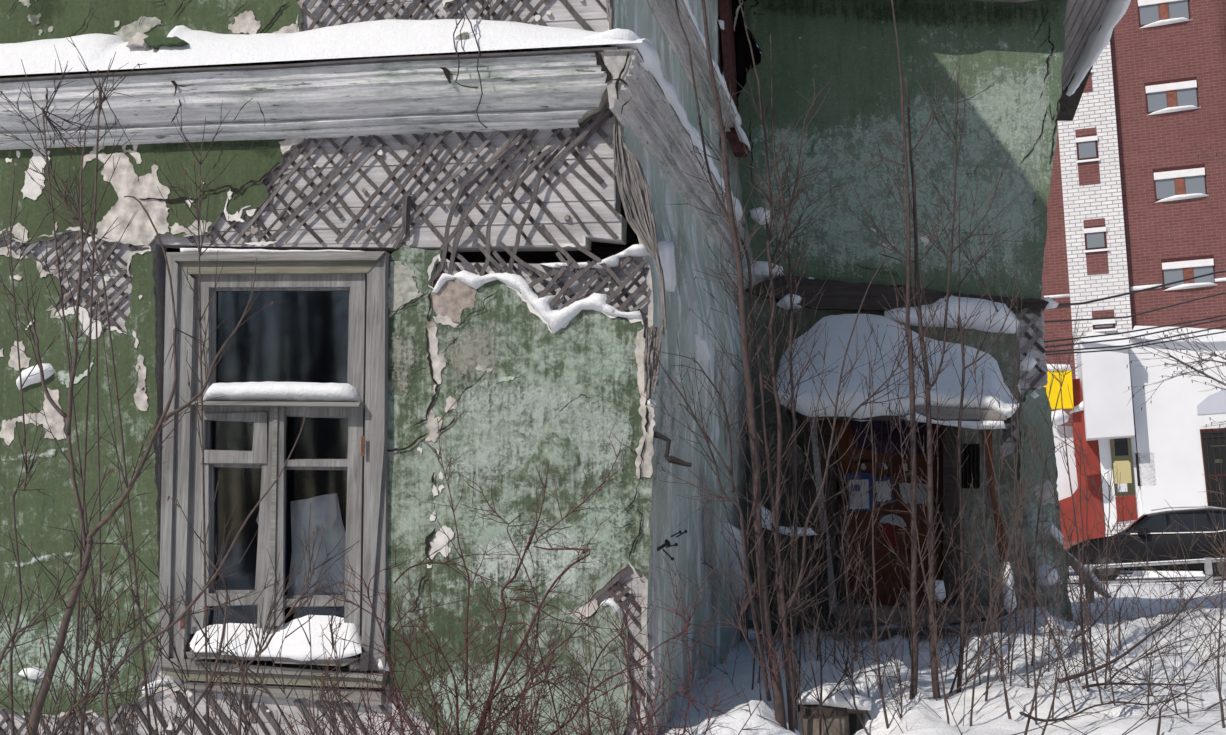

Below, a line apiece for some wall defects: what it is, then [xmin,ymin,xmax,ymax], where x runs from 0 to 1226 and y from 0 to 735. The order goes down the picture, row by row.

crack [259,2,290,34]
spalling [228,0,611,59]
leakage [744,54,1056,285]
spalling [0,106,656,479]
crack [387,291,495,452]
crack [411,472,435,613]
flaking render [427,471,454,568]